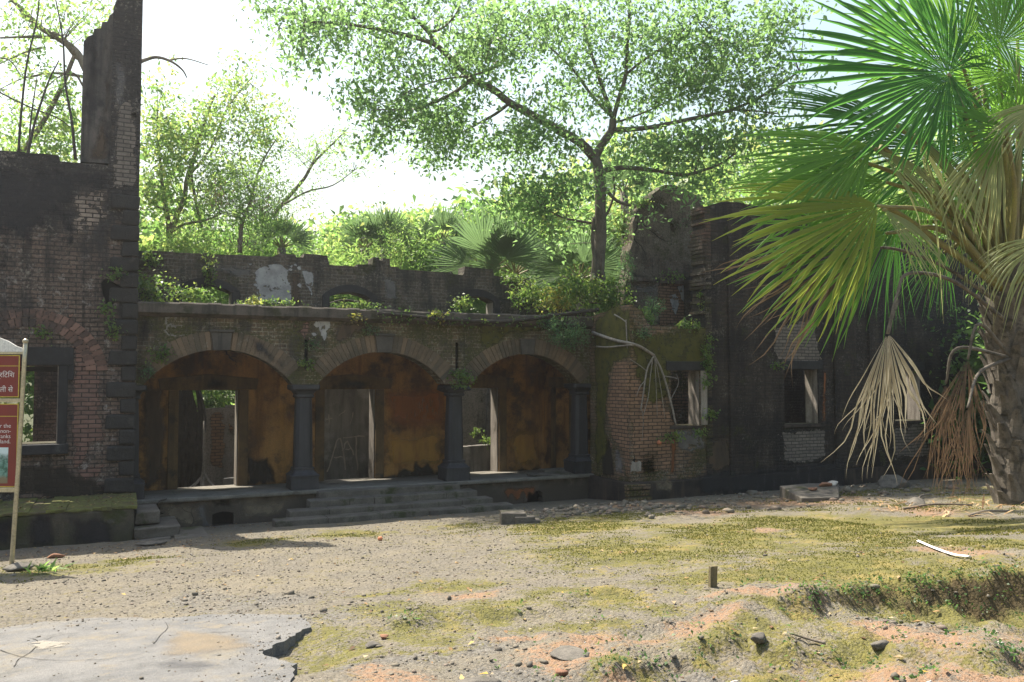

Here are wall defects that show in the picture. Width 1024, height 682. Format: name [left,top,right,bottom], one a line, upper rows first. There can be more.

peeling [249,263,314,305]
peeling [295,321,330,341]
flaking render [605,206,713,476]
flaking render [773,320,822,365]
flaking render [777,429,826,463]
damp [247,457,275,485]
damp [385,462,438,478]